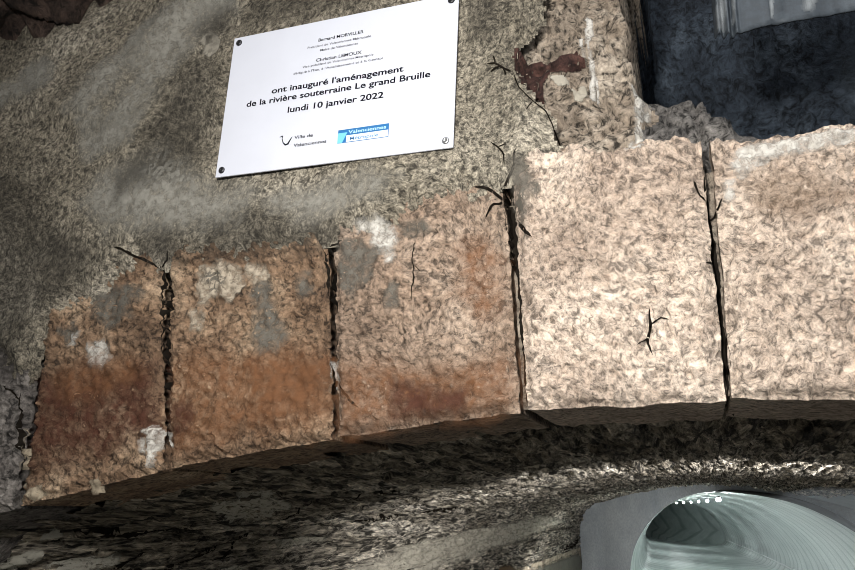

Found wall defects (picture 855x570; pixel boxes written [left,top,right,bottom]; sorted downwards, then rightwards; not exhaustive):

crack [487,56,561,146]
crack [474,142,532,408]
crack [637,309,667,355]
crack [3,386,32,460]